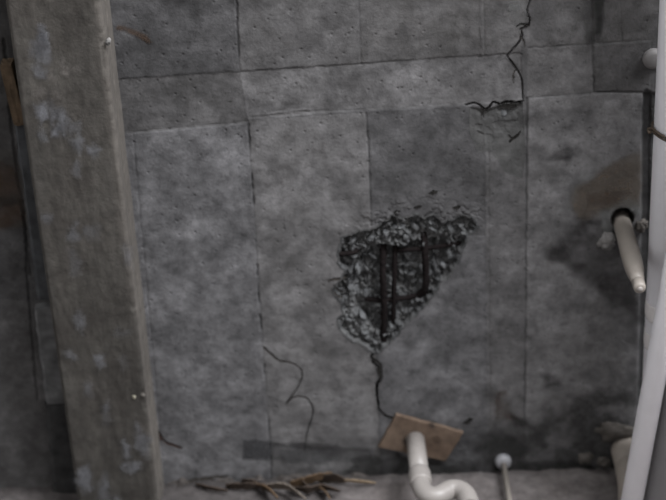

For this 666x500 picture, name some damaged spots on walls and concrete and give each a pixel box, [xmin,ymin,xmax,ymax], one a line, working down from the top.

crack [466,0,531,117]
spalling [331,205,480,354]
crack [263,347,313,450]
crack [370,348,393,419]